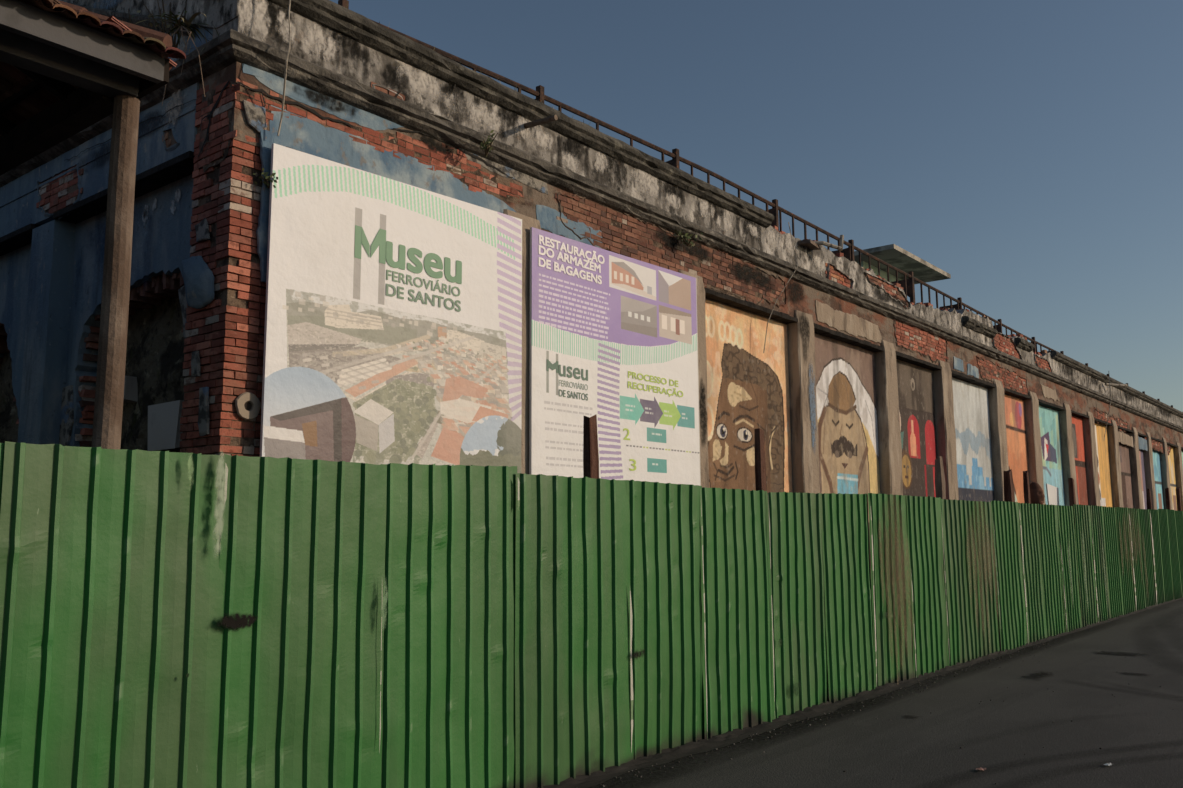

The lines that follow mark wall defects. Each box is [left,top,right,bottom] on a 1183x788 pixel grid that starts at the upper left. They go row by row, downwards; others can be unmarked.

leakage [238,0,368,78]
leakage [295,88,355,115]
leakage [385,63,684,208]
flaking render [36,163,84,220]
flaking render [170,63,788,553]
leakage [658,230,709,260]
leakage [699,200,797,256]
flaking render [825,253,853,289]
flaking render [862,267,985,317]
flaking render [815,300,1059,401]